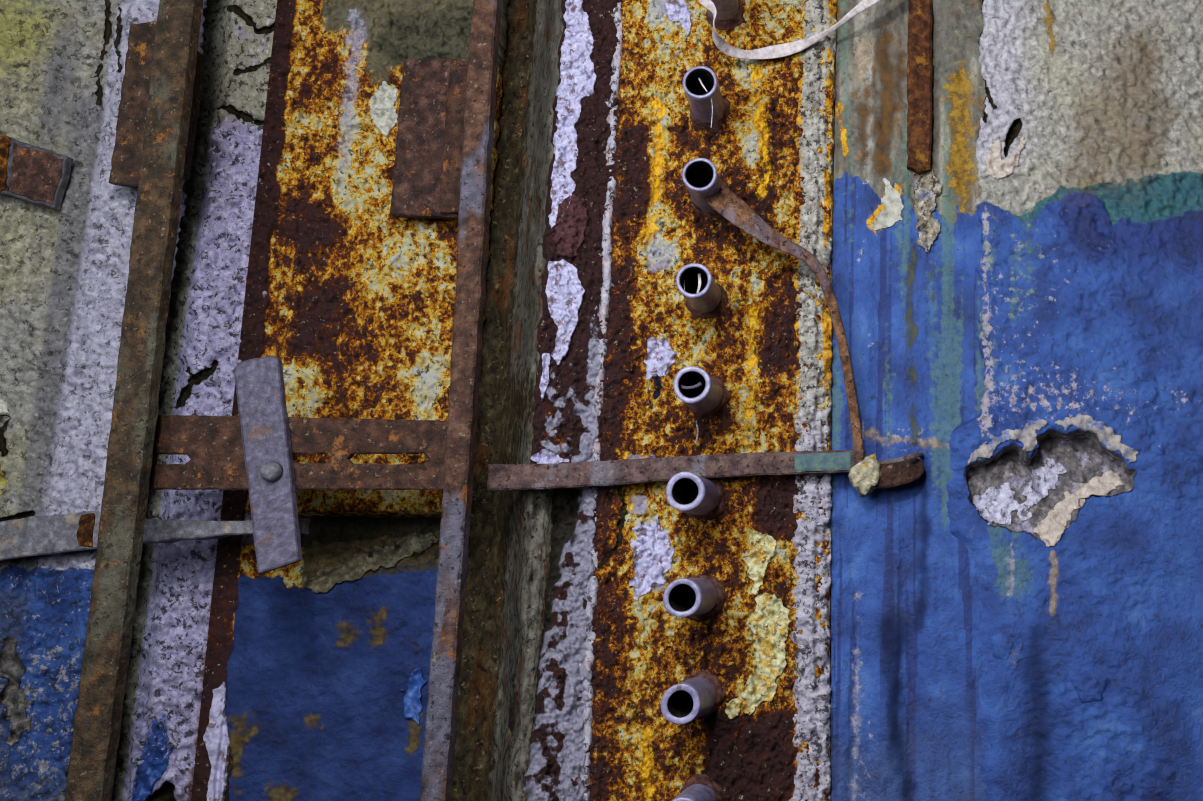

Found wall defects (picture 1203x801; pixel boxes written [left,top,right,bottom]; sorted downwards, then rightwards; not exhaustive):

crack [94,0,123,105]
rust [237,0,473,421]
rust [641,98,666,244]
rust [750,64,773,197]
spalling [985,136,1026,180]
spalling [0,393,13,427]
rust [350,454,428,465]
rust [740,306,759,451]
spalling [965,414,1139,547]
rust [191,490,443,801]
peeling [134,745,174,801]
rust [635,728,655,801]